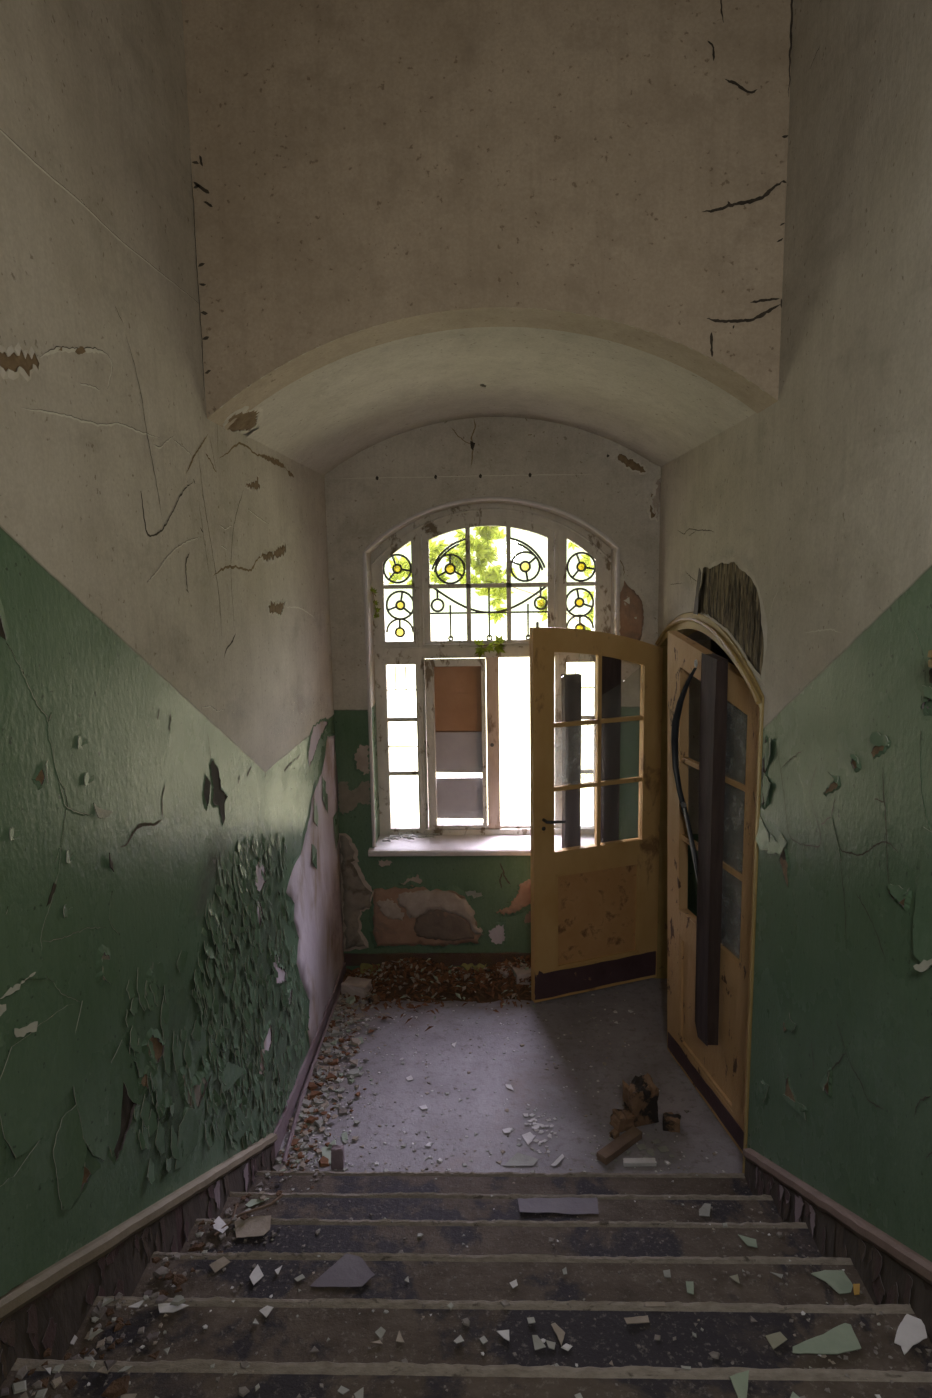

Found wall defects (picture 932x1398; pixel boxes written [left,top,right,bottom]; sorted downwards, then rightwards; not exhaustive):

crack [708,0,821,97]
crack [703,180,787,242]
crack [707,298,782,357]
flaking render [0,342,113,386]
flaking render [223,406,264,438]
flaking render [214,474,286,617]
flaking render [268,599,313,618]
flaking render [693,555,768,684]
peeling [888,827,932,972]
peeling [0,717,535,1387]
peeling [337,1386,364,1398]